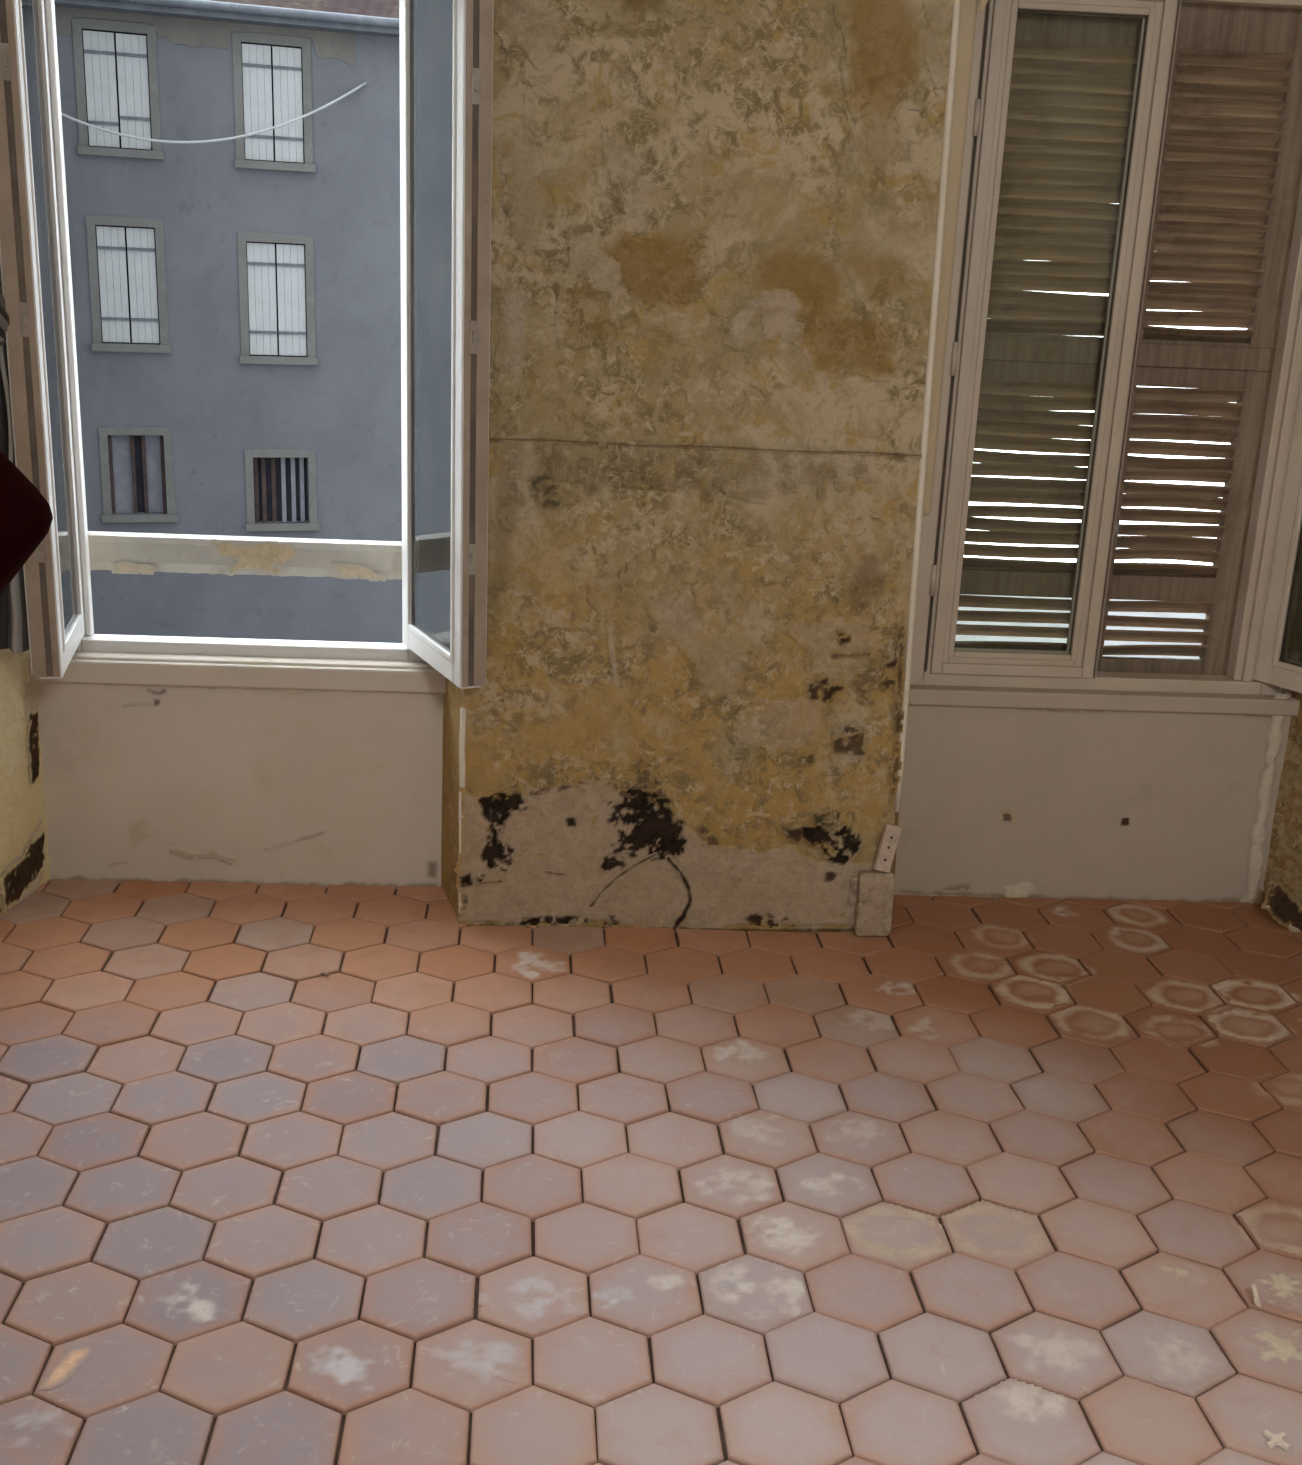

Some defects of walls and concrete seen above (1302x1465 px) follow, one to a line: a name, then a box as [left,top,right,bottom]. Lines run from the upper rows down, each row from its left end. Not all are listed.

leakage [834,0,927,206]
leakage [555,223,712,350]
leakage [748,233,926,382]
flaking render [22,677,40,786]
flaking render [0,817,46,914]
flaking render [454,780,875,933]
leakage [945,923,1302,1050]
leakage [151,1278,223,1324]
leakage [424,1165,1061,1395]
leakage [1226,1200,1302,1261]
leakage [302,1345,381,1395]
leakage [975,1325,1110,1435]